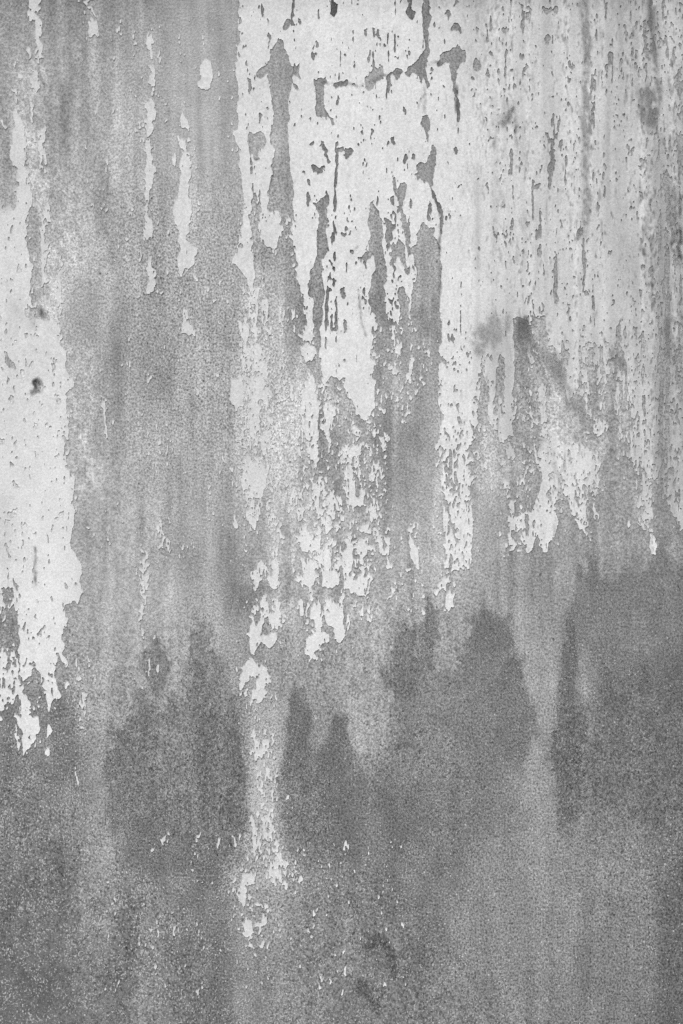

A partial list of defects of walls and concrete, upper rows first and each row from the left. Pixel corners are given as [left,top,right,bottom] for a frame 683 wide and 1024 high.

peeling [0,0,114,756]
peeling [195,0,683,987]
damp [107,629,250,853]
damp [279,693,364,849]
damp [380,603,535,811]
damp [554,551,683,835]
peeling [133,879,225,1001]